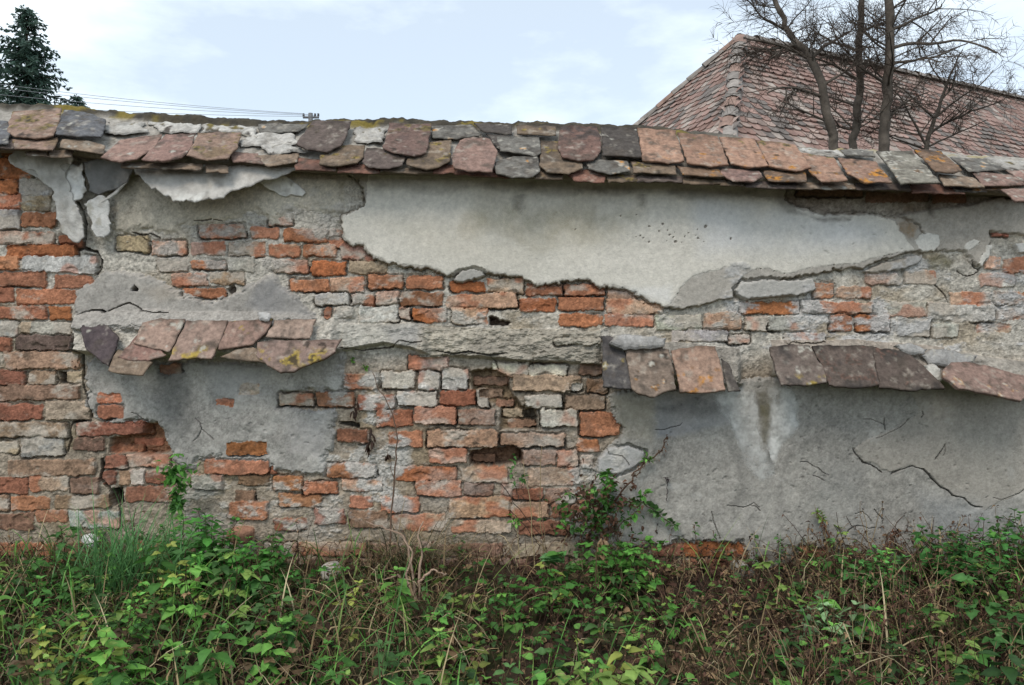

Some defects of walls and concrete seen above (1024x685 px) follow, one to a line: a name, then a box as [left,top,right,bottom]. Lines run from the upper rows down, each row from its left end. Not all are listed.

crack [77,302,169,315]
spalling [0,151,1024,553]
water stain [716,388,798,478]
crack [852,410,1024,507]
spalling [675,539,747,570]